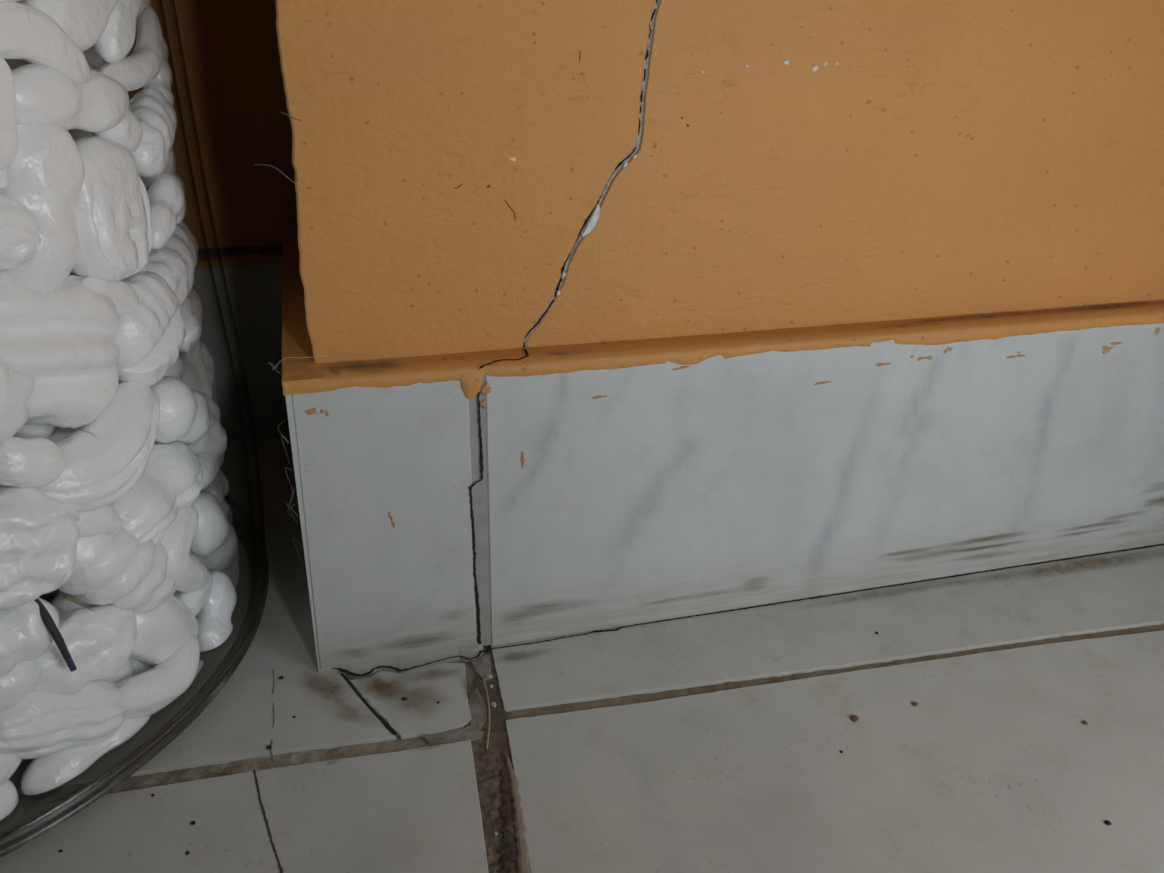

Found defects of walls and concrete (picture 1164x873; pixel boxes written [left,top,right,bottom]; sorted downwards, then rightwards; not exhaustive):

crack [331,0,1164,736]
crack [253,669,283,873]